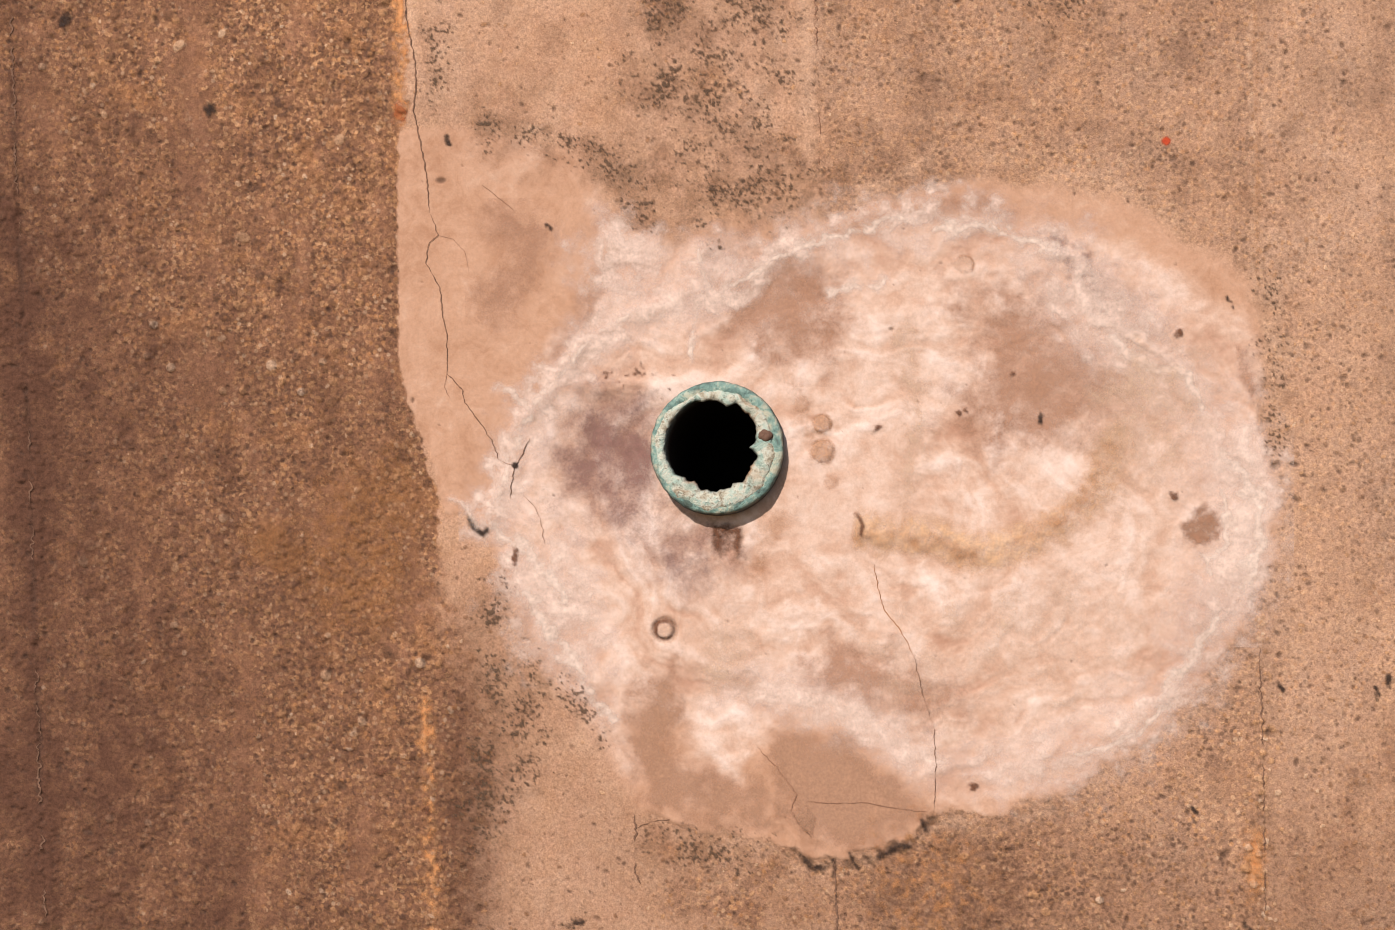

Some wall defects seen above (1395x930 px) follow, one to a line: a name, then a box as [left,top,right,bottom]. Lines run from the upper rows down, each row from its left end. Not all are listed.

crack [405,0,544,539]
water stain [448,0,1294,875]
crack [761,569,937,930]